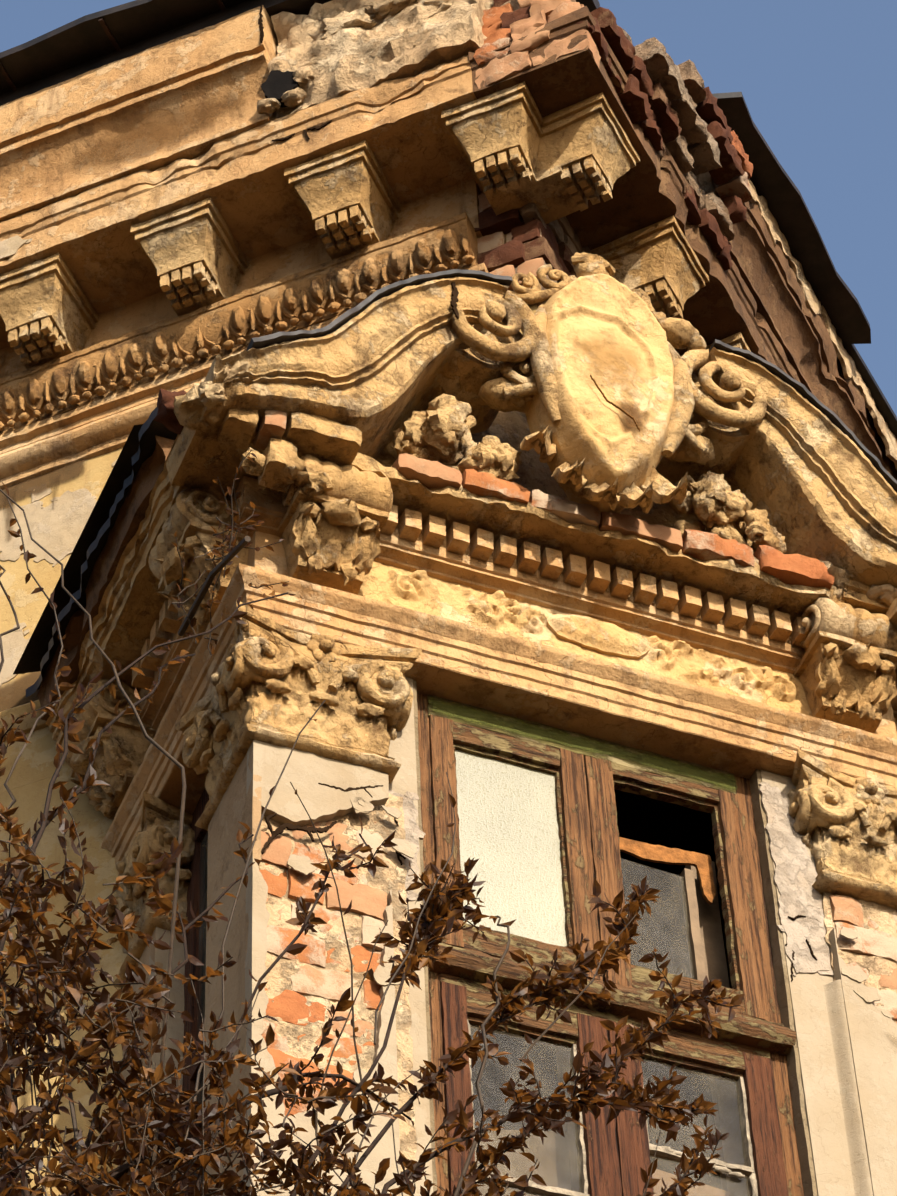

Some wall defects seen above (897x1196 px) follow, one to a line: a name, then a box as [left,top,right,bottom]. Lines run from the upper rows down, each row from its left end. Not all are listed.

crack [590,375,640,431]
crack [318,783,383,797]
crack [261,813,337,854]
crack [394,818,406,865]
peeling [759,782,897,1023]
spalling [258,788,426,1176]